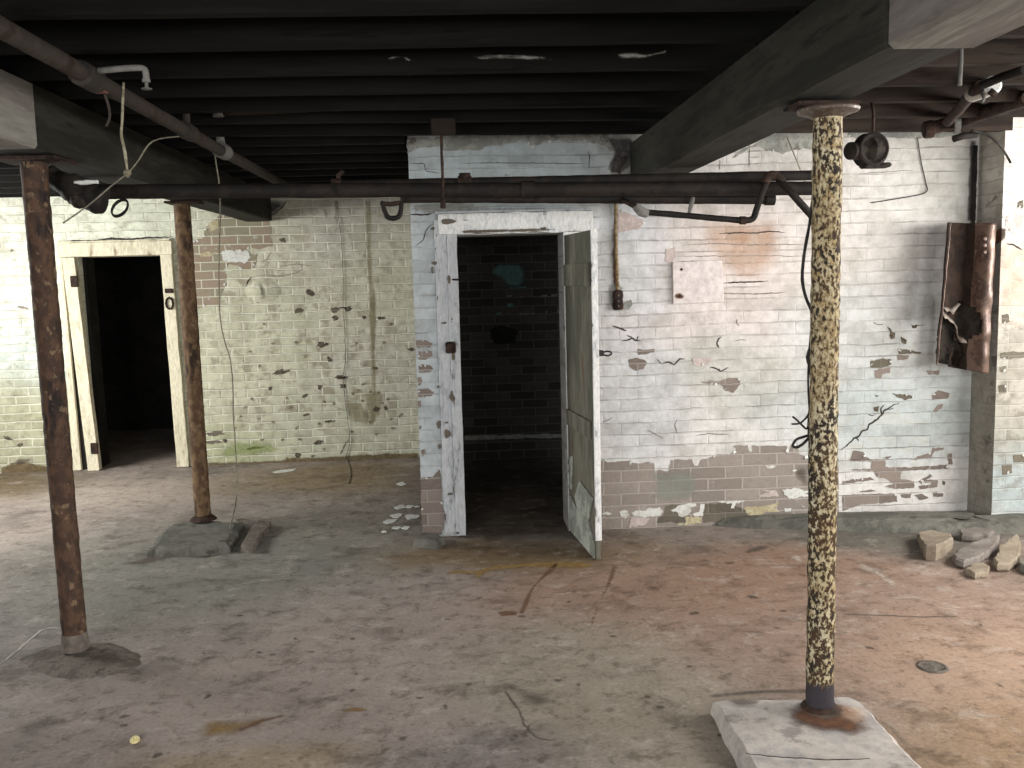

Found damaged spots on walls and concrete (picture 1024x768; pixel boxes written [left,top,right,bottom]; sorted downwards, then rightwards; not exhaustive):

flaking render [193,215,286,308]
flaking render [407,339,434,408]
crack [841,403,899,450]
flaking render [601,443,809,529]
flaking render [837,447,953,512]
corrosion [793,704,864,732]